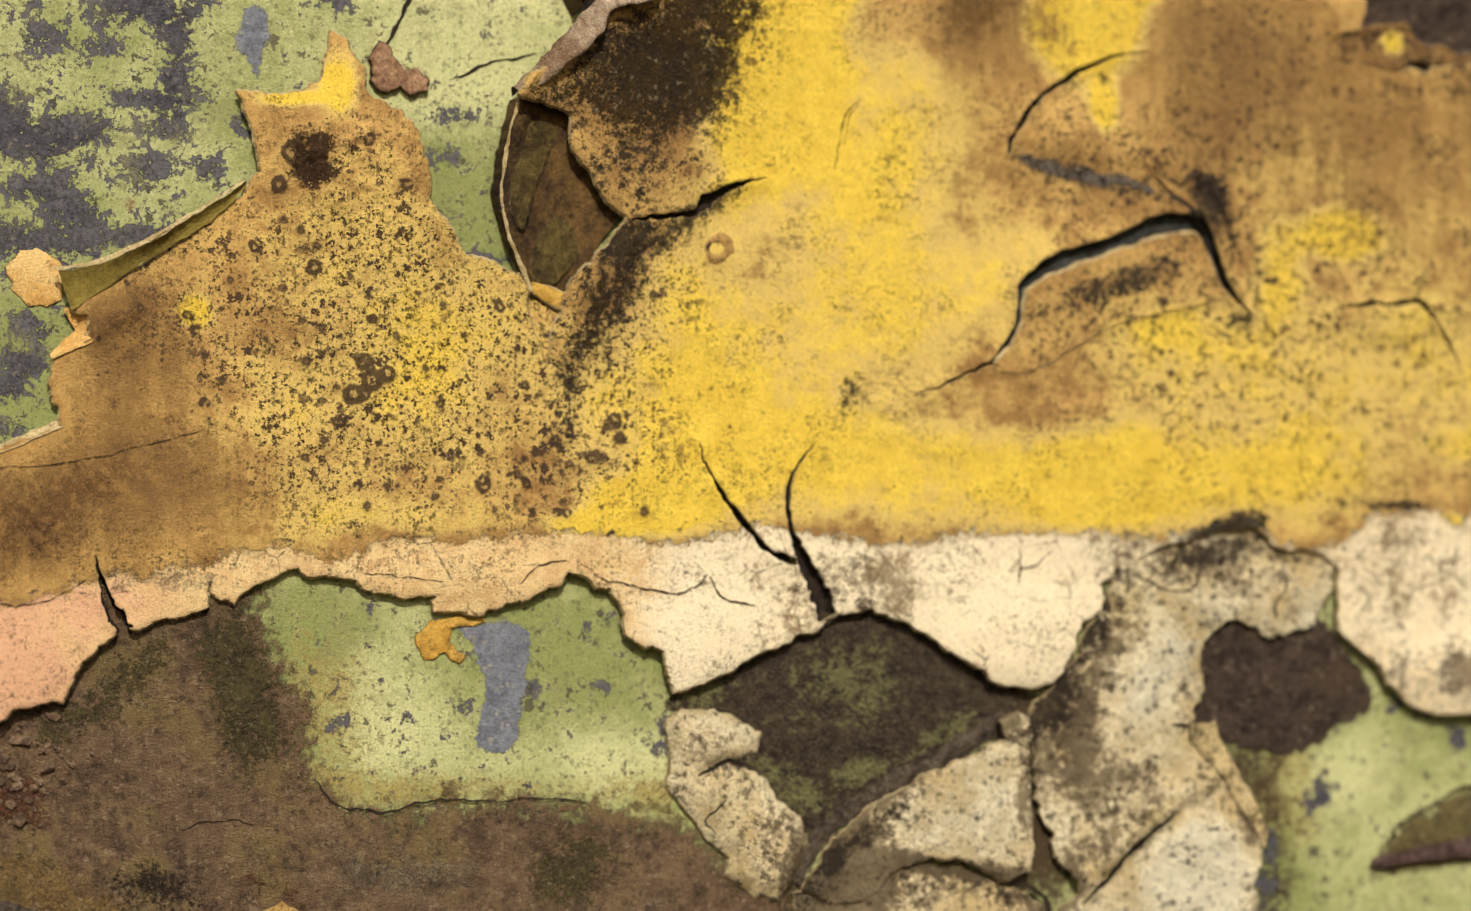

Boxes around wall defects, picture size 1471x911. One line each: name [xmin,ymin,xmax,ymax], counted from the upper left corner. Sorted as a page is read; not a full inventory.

crack [1007,52,1147,184]
crack [1169,196,1249,313]
peeling [0,0,1471,723]
crack [920,363,988,393]
crack [1333,298,1453,352]
crack [0,559,130,633]
crack [701,450,835,619]
peeling [456,619,532,754]
spalling [663,609,1020,902]
peeling [791,529,1373,911]
crack [1172,721,1196,729]
crack [1008,811,1177,911]